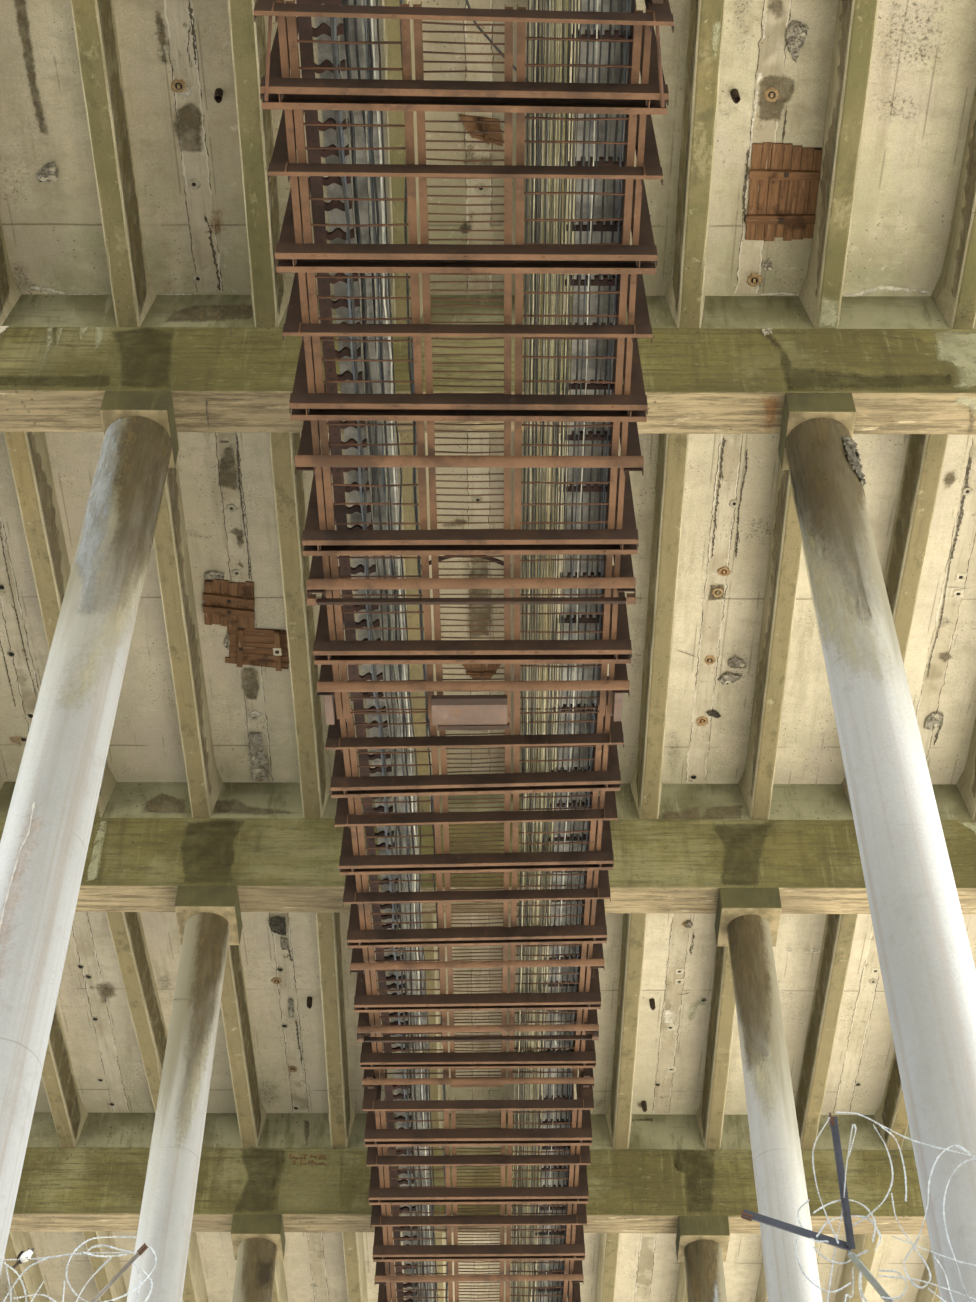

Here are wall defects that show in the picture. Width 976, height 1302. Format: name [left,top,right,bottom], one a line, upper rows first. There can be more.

crack [187,0,197,64]
spalling [785,21,809,63]
spalling [36,161,59,183]
leakage [0,0,253,387]
crack [0,528,37,707]
leakage [28,432,64,602]
leakage [75,415,290,882]
crack [711,438,748,558]
leakage [663,417,865,885]
spalling [841,435,866,486]
crack [927,457,972,677]
spalling [269,916,289,950]